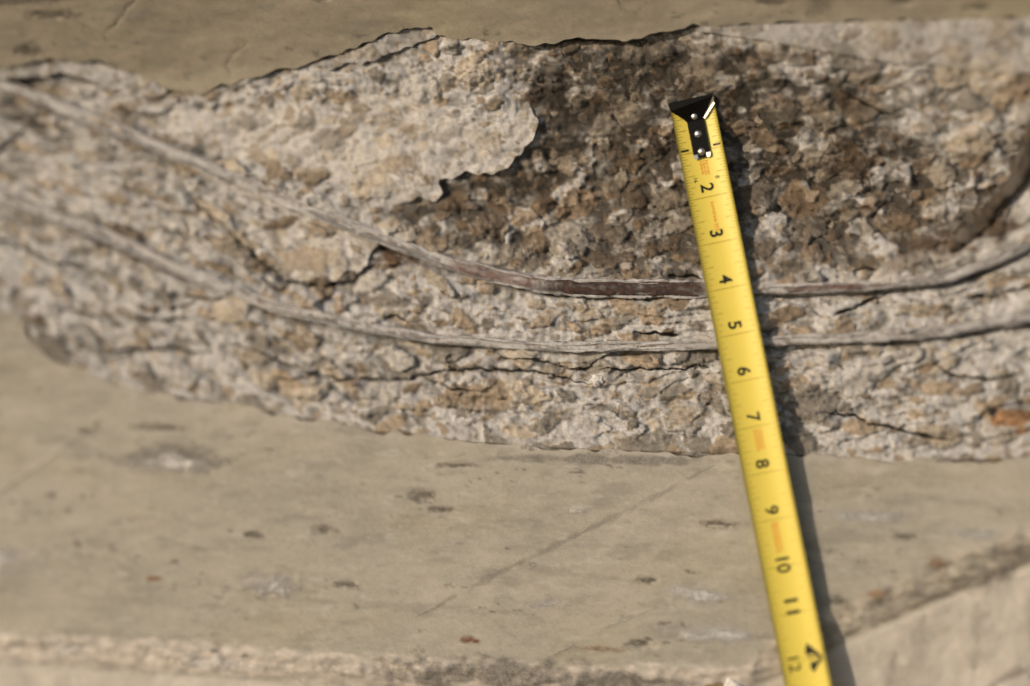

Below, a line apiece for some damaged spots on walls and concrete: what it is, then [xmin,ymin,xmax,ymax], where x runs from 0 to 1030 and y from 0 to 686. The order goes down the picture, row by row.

spalling [0,6,1030,463]
rust [377,248,419,275]
rust [548,278,704,298]
rust [792,284,861,292]